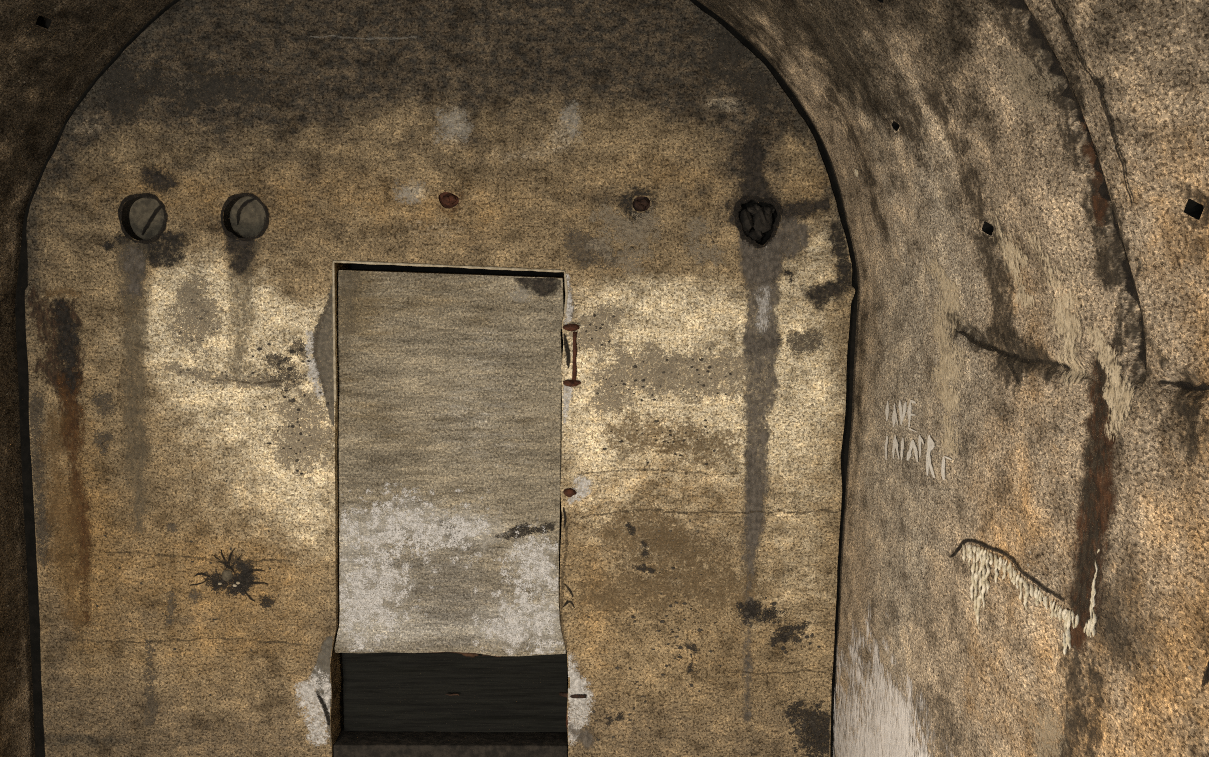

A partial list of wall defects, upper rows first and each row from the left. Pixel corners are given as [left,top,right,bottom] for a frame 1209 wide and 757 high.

corrosion [28,287,91,621]
water stain [337,483,646,748]
water stain [726,125,851,721]
water stain [780,612,954,757]
crack [946,312,1088,392]
water stain [950,539,1103,757]
corrosion [1070,350,1119,650]
crack [994,0,1209,462]
crack [1201,660,1209,687]